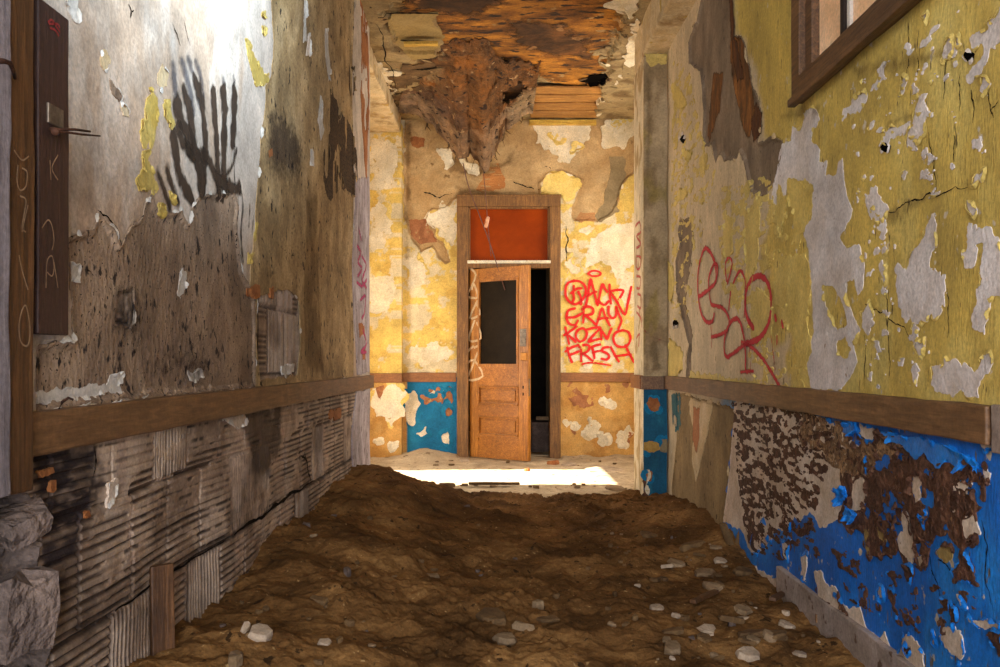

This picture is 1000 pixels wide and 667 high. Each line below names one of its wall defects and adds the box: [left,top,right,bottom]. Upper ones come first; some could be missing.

flaking render [35,0,667,411]
peeling [667,0,1000,401]
crack [889,62,998,213]
flaking render [351,383,456,467]
peeling [562,382,634,449]
crack [115,585,150,612]
crack [174,452,314,571]
peeling [643,392,1000,667]